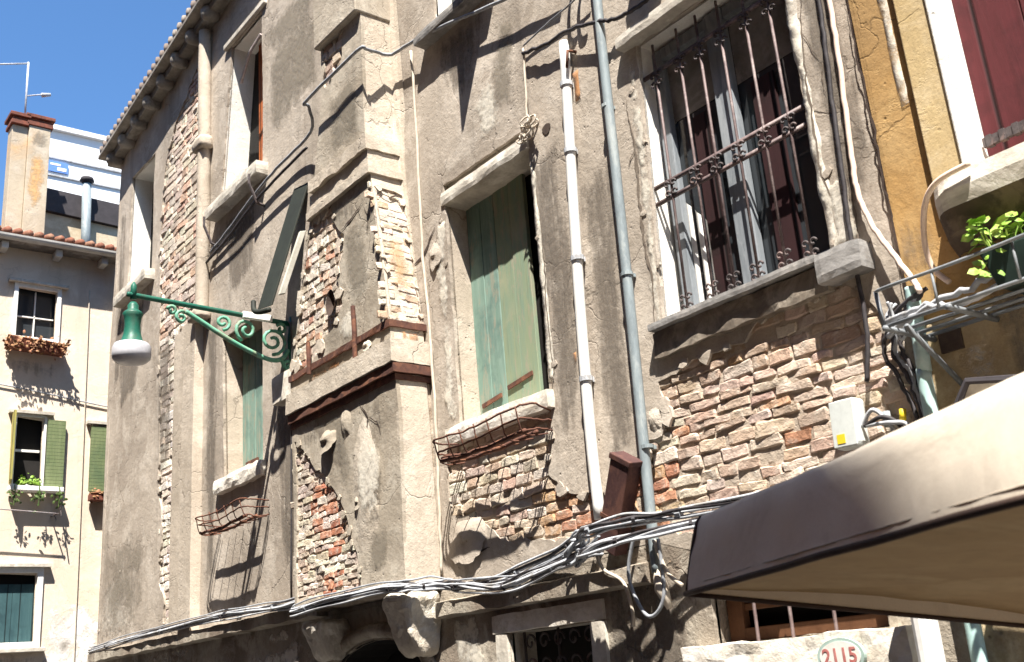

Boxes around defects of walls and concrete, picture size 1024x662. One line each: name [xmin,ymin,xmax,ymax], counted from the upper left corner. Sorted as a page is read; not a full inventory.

spalling [321,29,344,84]
crack [800,0,905,284]
spalling [157,69,198,626]
spalling [290,208,344,373]
flaking render [364,181,424,334]
spalling [290,440,362,602]
spalling [448,412,607,542]